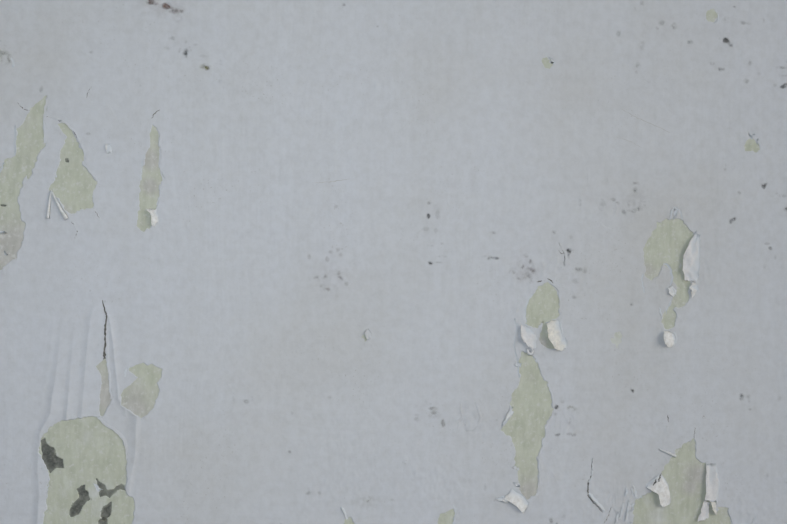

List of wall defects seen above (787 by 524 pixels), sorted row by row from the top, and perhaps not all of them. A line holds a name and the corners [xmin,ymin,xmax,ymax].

peeling [0,95,99,270]
peeling [137,125,165,232]
peeling [641,206,700,347]
peeling [39,359,162,524]
peeling [496,281,567,513]
peeling [615,427,756,524]